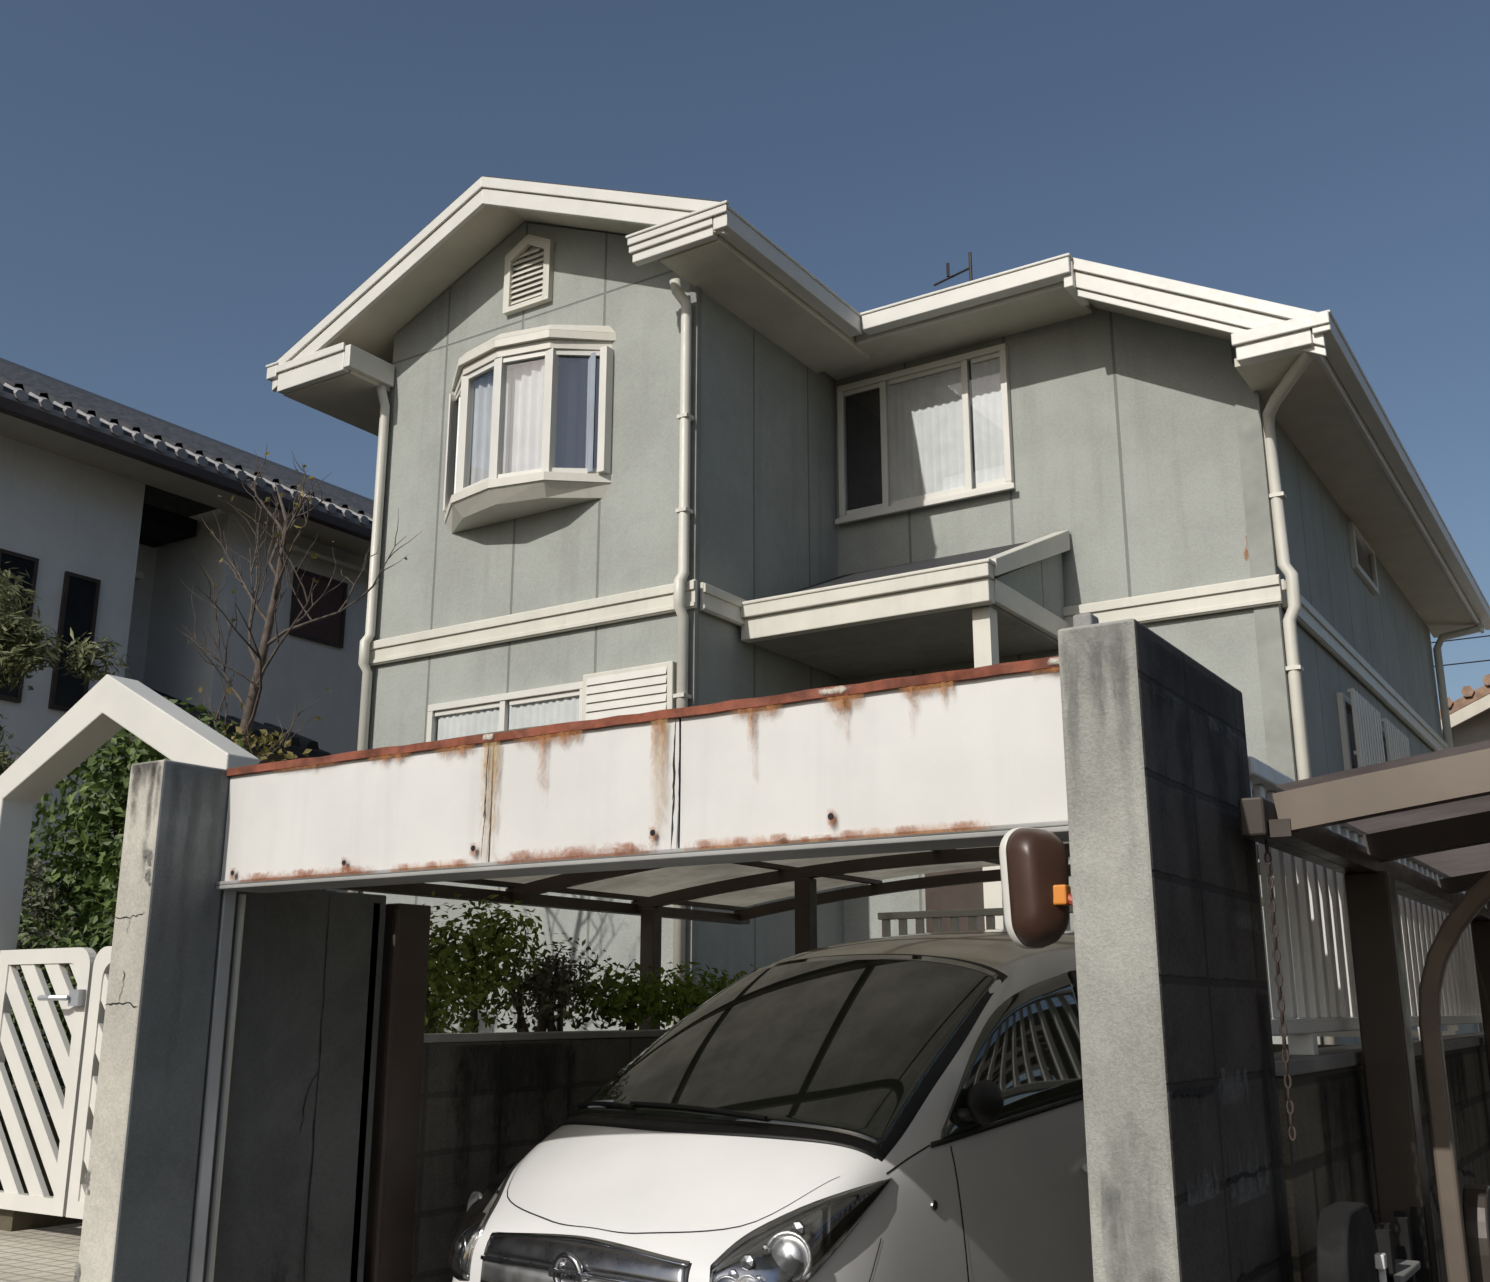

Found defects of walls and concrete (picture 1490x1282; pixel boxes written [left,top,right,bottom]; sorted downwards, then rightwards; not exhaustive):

corrosion [829,693,858,710]
corrosion [523,730,576,754]
corrosion [499,828,655,864]
corrosion [698,811,983,850]
crack [107,971,137,1008]